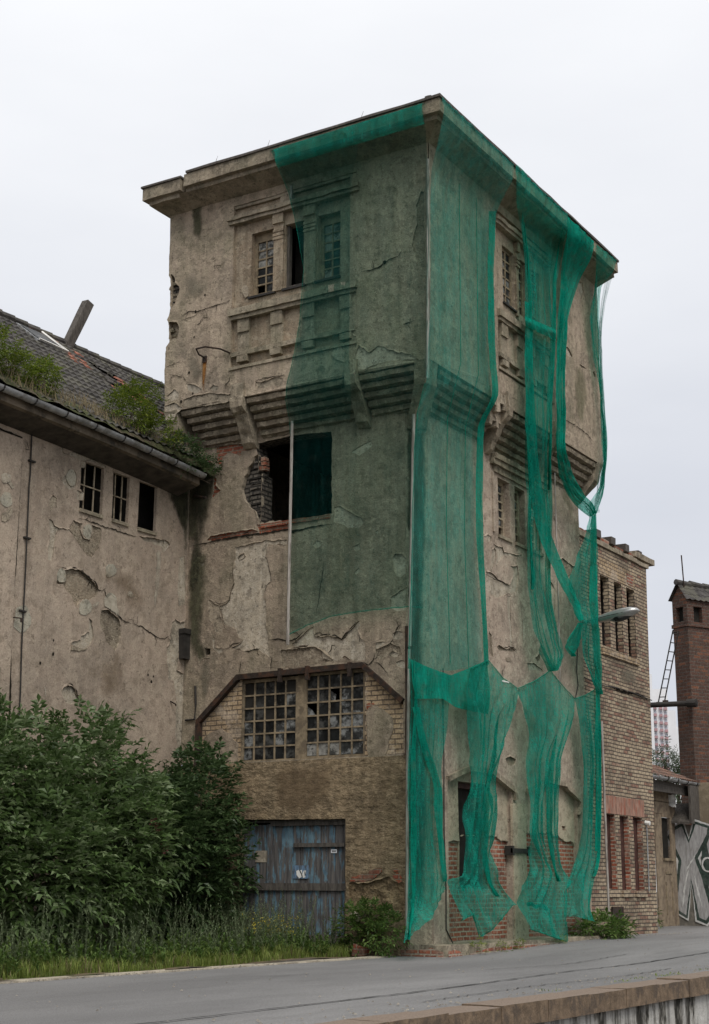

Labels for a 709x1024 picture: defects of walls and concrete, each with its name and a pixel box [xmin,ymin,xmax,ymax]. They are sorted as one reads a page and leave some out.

peeling [208,441,405,669]